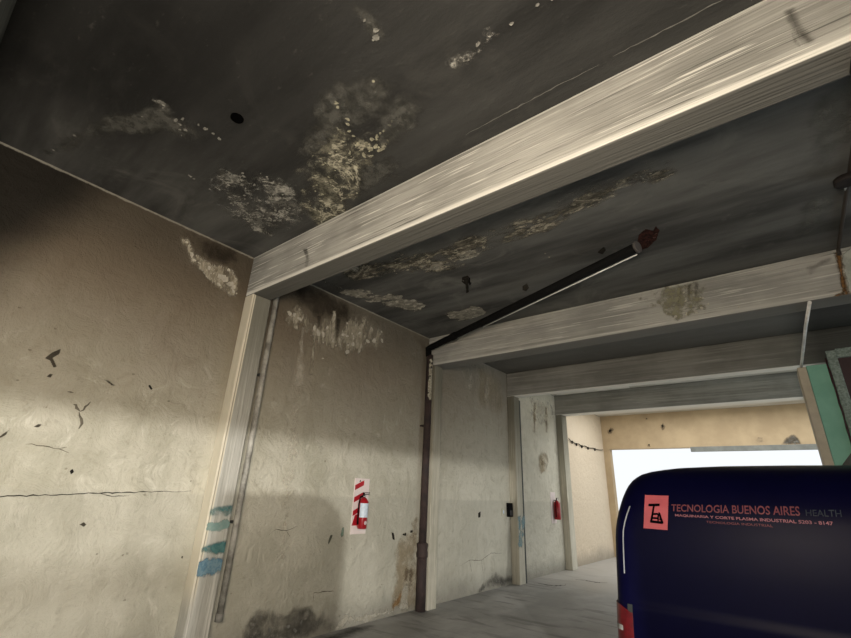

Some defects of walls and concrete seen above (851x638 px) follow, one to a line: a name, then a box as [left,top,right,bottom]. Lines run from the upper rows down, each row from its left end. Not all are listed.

peeling [450,36,490,67]
peeling [337,169,675,311]
peeling [181,239,238,296]
rust [834,253,849,296]
peeling [447,306,487,321]
crack [0,490,186,498]
leakage [245,609,320,638]
leakage [329,627,364,638]